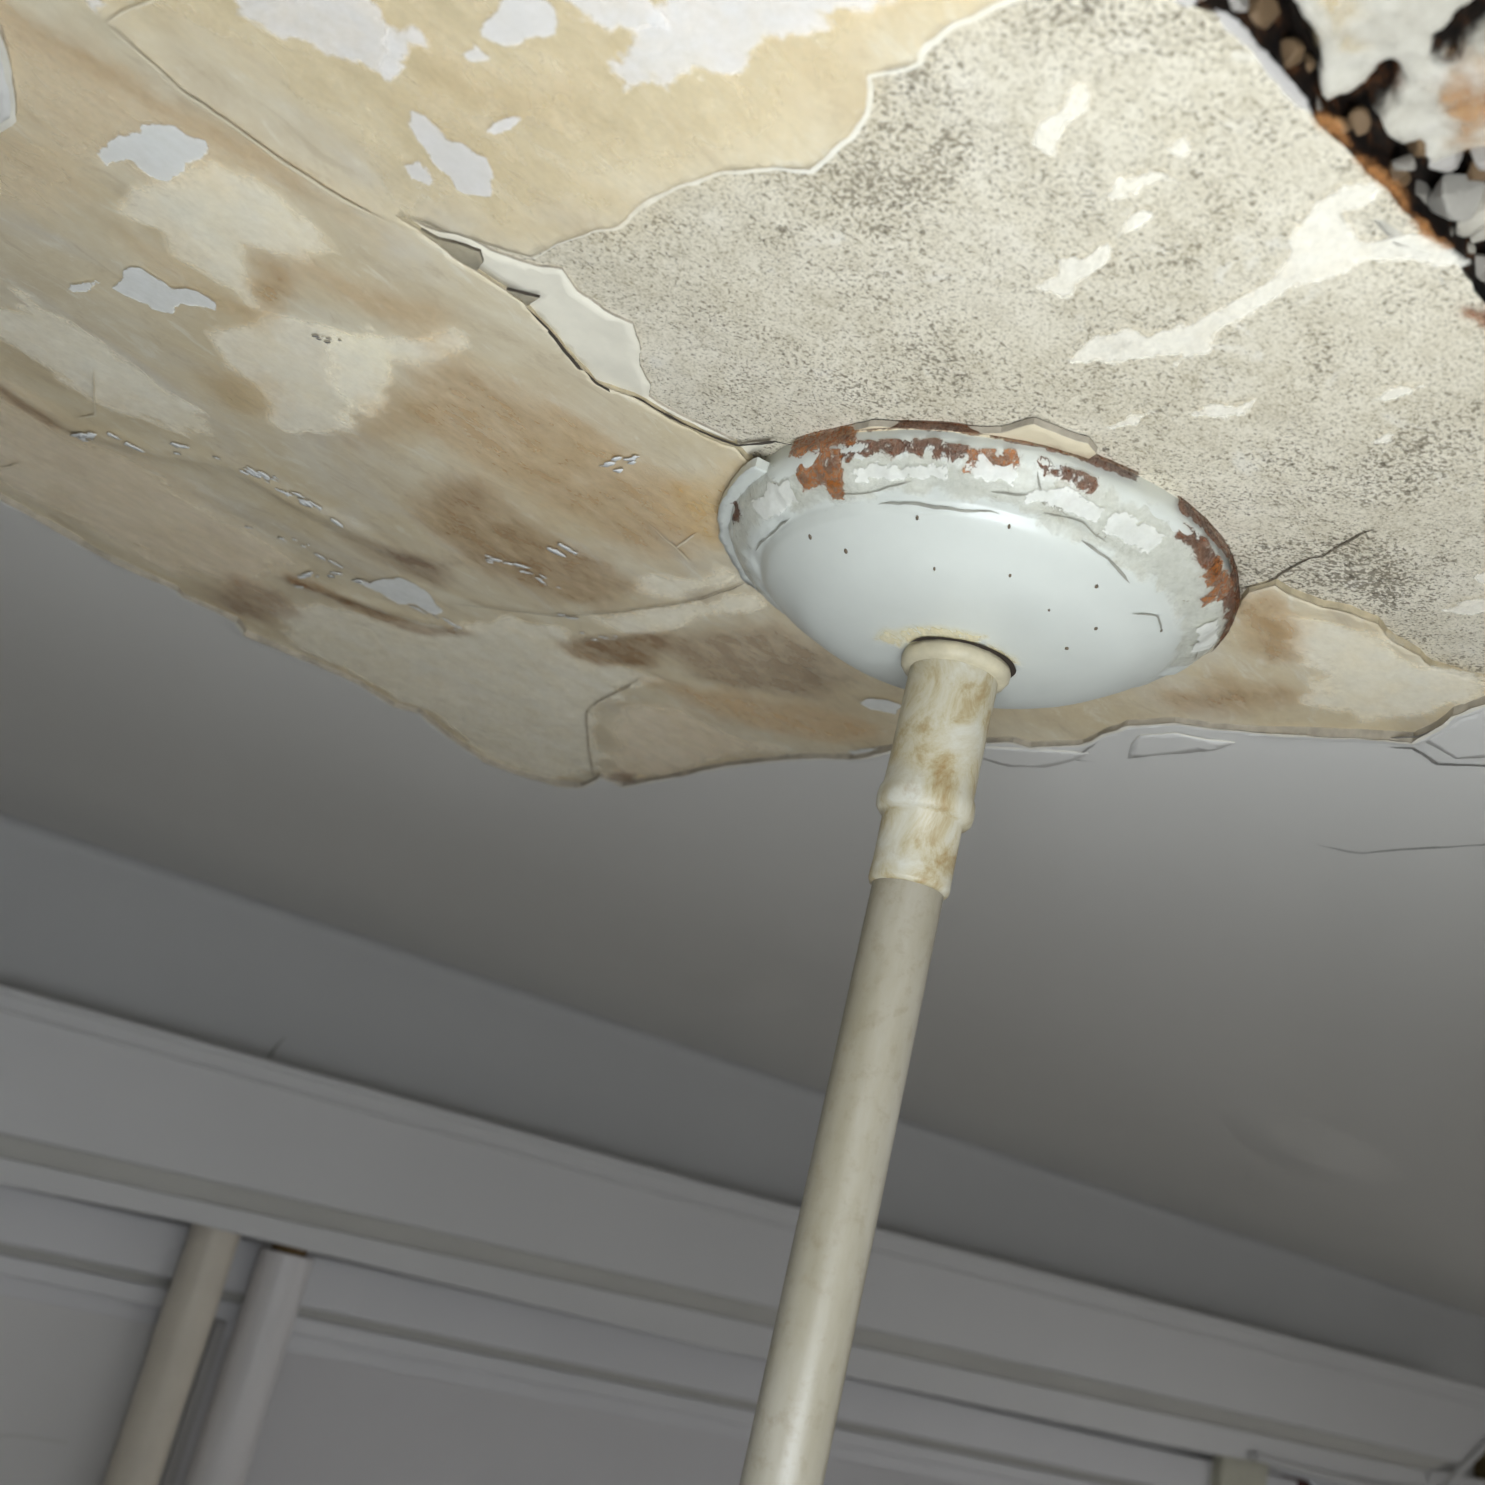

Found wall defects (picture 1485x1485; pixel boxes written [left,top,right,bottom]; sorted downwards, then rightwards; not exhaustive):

peeling [0,0,1485,789]
leakage [406,368,724,552]
leakage [368,543,441,584]
leakage [416,481,634,602]
crack [1240,527,1379,590]
leakage [218,576,465,635]
leakage [561,627,869,739]
crack [1393,730,1485,767]
crack [1324,844,1485,854]